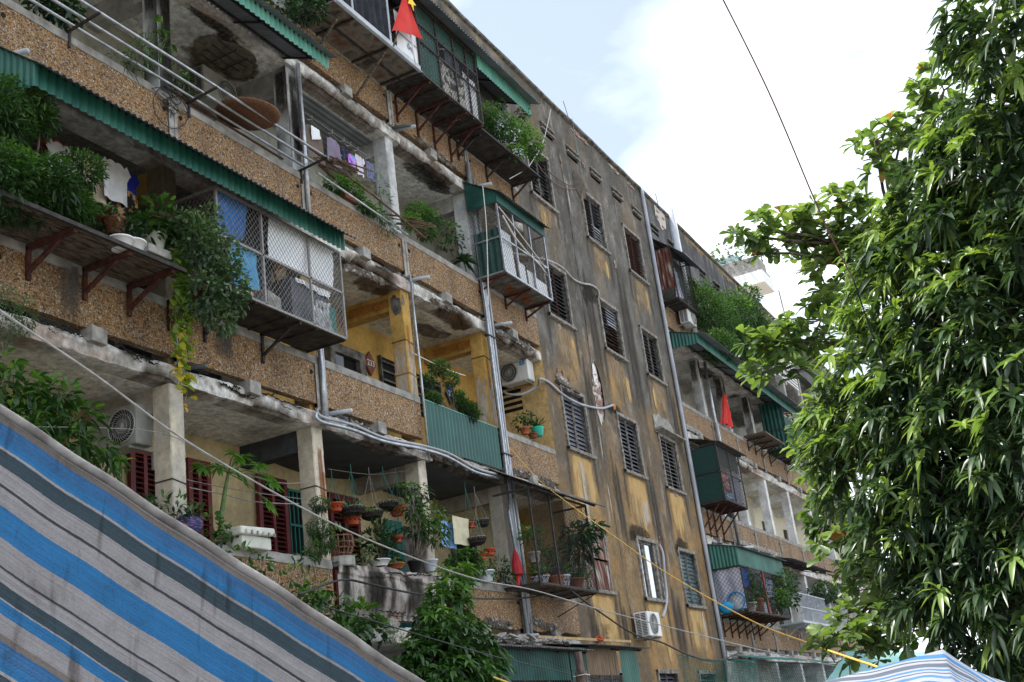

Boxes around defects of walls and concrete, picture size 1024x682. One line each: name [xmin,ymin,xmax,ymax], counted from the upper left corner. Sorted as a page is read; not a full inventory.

spalling [193,36,257,78]
flaking render [591,360,605,425]
water stain [567,452,600,521]
water stain [610,451,690,554]
water stain [588,594,629,645]
water stain [644,590,710,662]